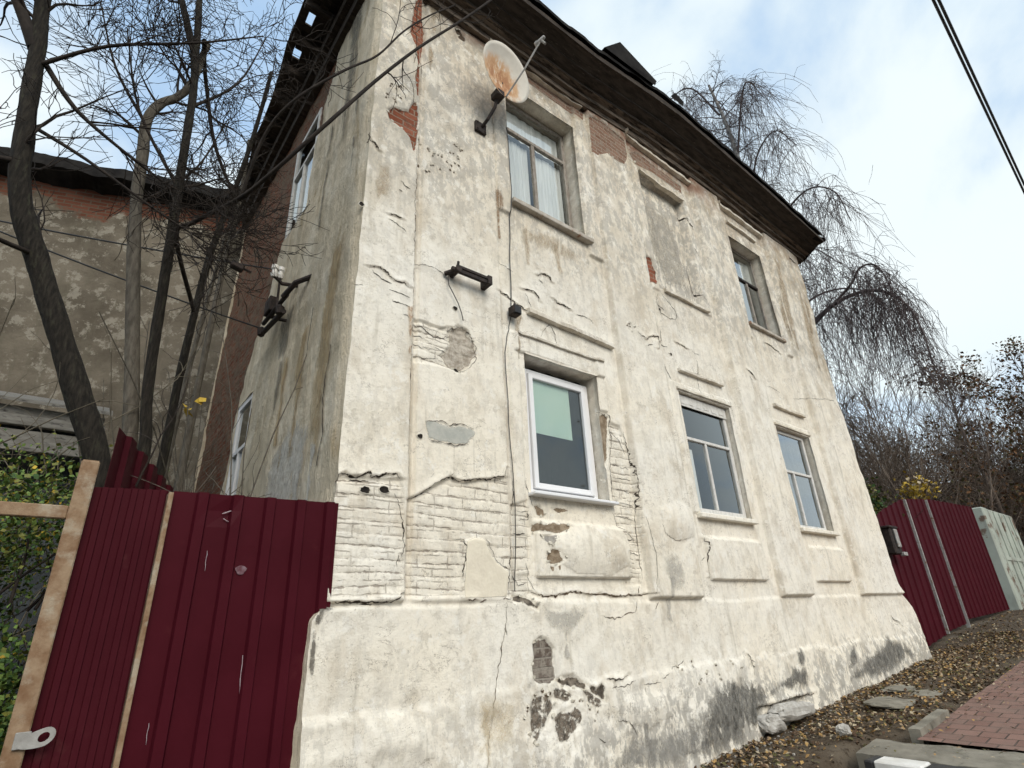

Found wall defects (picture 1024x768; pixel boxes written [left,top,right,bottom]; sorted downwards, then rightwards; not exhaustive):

spalling [385,0,463,173]
spalling [527,76,682,194]
crack [354,149,477,392]
spalling [441,326,476,373]
crack [500,264,593,344]
spalling [646,257,657,284]
spalling [595,413,609,462]
crack [316,344,711,767]
spalling [531,504,570,571]
spalling [523,639,605,746]
damp [622,650,806,766]
damp [849,638,912,678]